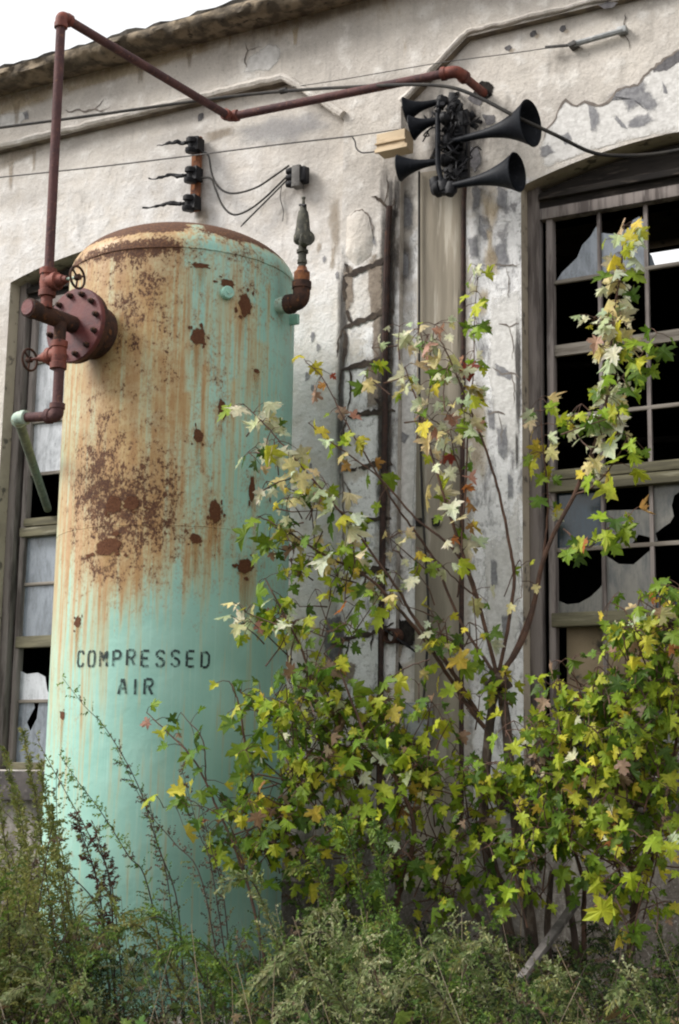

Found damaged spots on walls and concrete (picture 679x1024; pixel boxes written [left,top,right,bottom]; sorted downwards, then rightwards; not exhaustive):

flaking render [245,45,280,72]
flaking render [541,49,679,166]